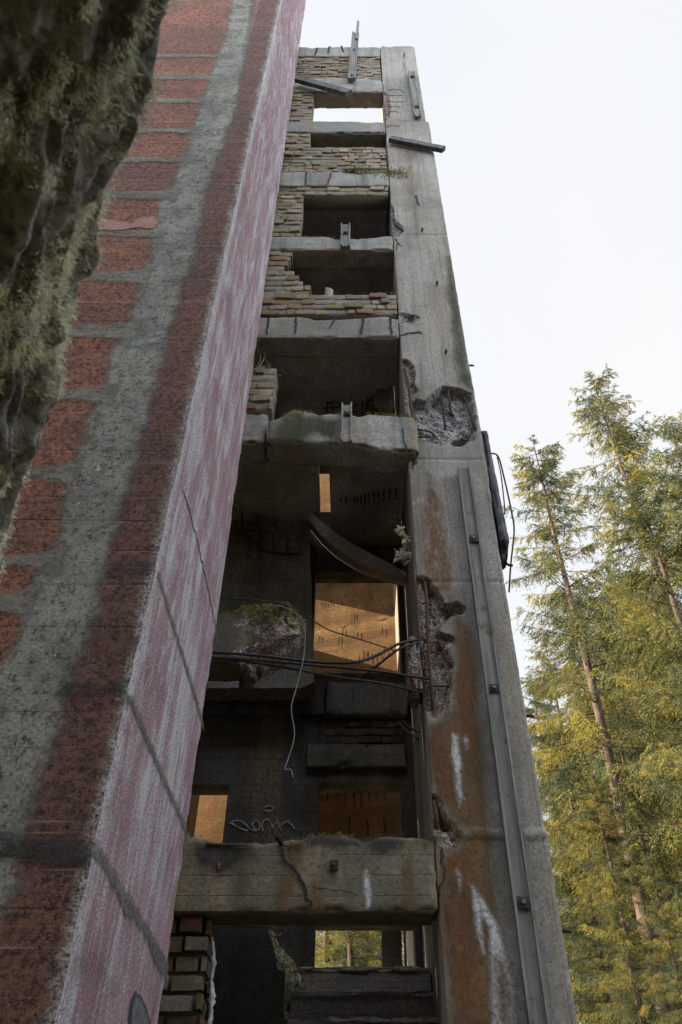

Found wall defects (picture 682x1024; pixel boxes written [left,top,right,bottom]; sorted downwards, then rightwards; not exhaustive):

spalling [383,359,478,447]
rust [425,489,450,597]
spalling [416,576,466,718]
crack [274,834,359,910]
spalling [431,794,463,847]
rust [430,618,498,1024]